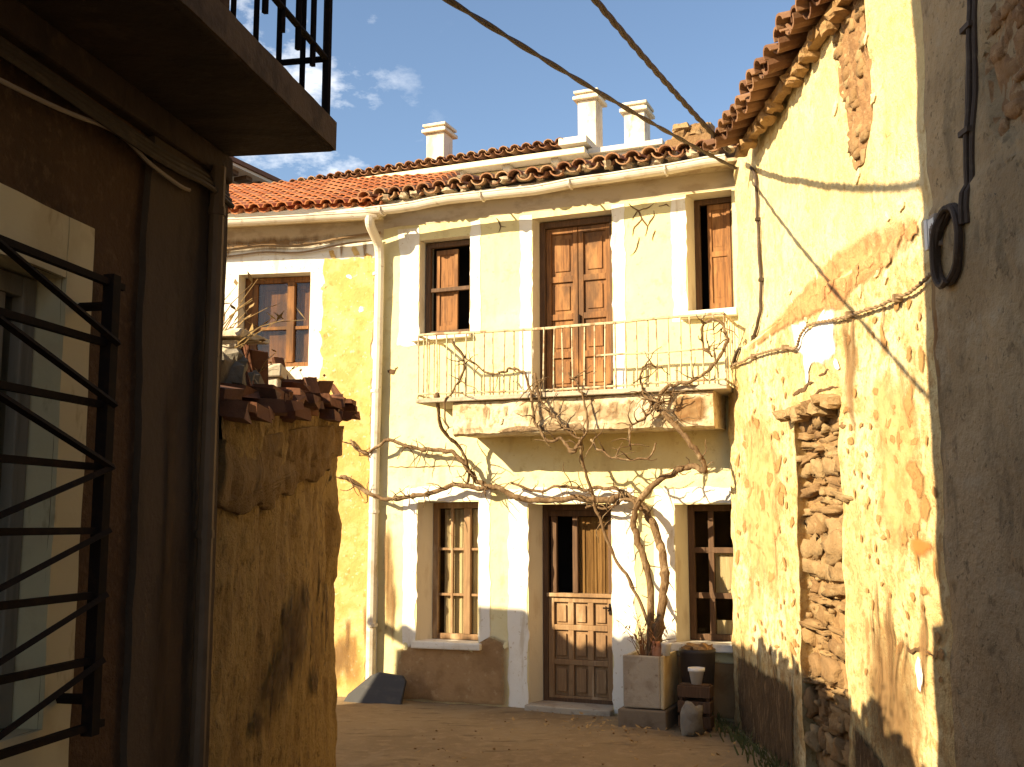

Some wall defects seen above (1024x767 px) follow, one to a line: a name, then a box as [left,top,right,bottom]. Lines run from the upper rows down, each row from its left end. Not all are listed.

flaking render [832,0,877,185]
crack [629,204,670,256]
water stain [254,585,354,735]